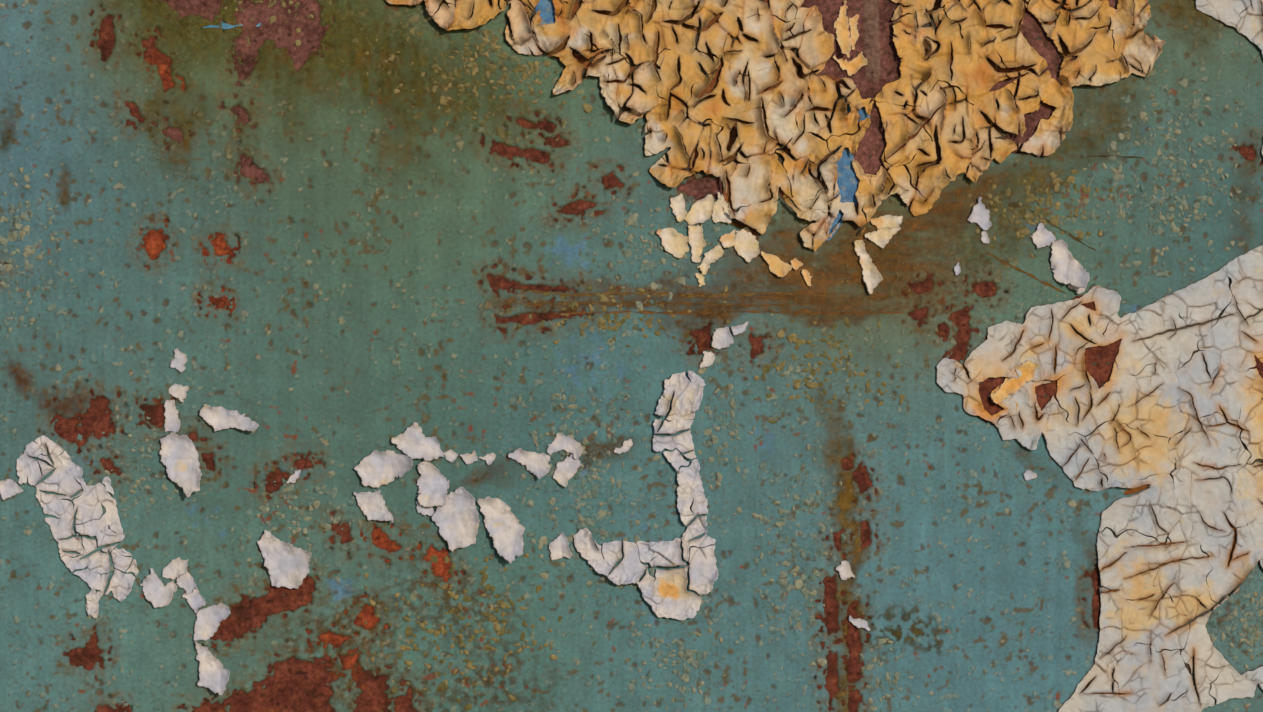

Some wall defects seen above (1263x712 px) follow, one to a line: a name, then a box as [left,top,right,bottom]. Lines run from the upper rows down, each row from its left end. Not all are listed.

crack [532,0,1142,240]
peeling [0,348,231,695]
peeling [199,404,259,432]
corrosion [210,568,320,648]
corrosion [177,594,424,712]
peeling [250,285,905,712]
corrosion [606,174,1005,363]
peeling [351,0,1263,712]
corrosion [815,436,943,712]
corrosion [970,377,1007,425]
corrosion [1076,339,1122,389]
crack [1003,300,1263,705]